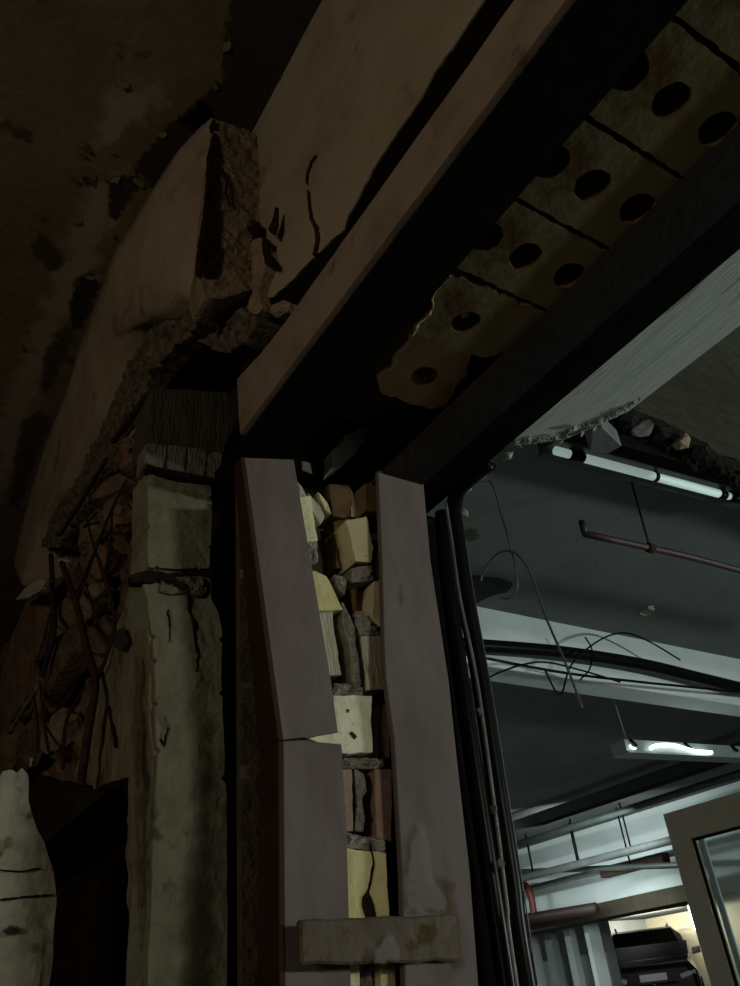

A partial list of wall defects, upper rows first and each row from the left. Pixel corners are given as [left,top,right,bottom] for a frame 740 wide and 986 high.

crack [305,155,321,256]
spalling [244,207,279,318]
spalling [411,276,451,336]
spalling [506,397,740,489]
spalling [39,310,222,783]
crack [127,569,212,672]
crack [279,735,306,743]
crack [0,868,55,901]
crack [362,841,377,918]